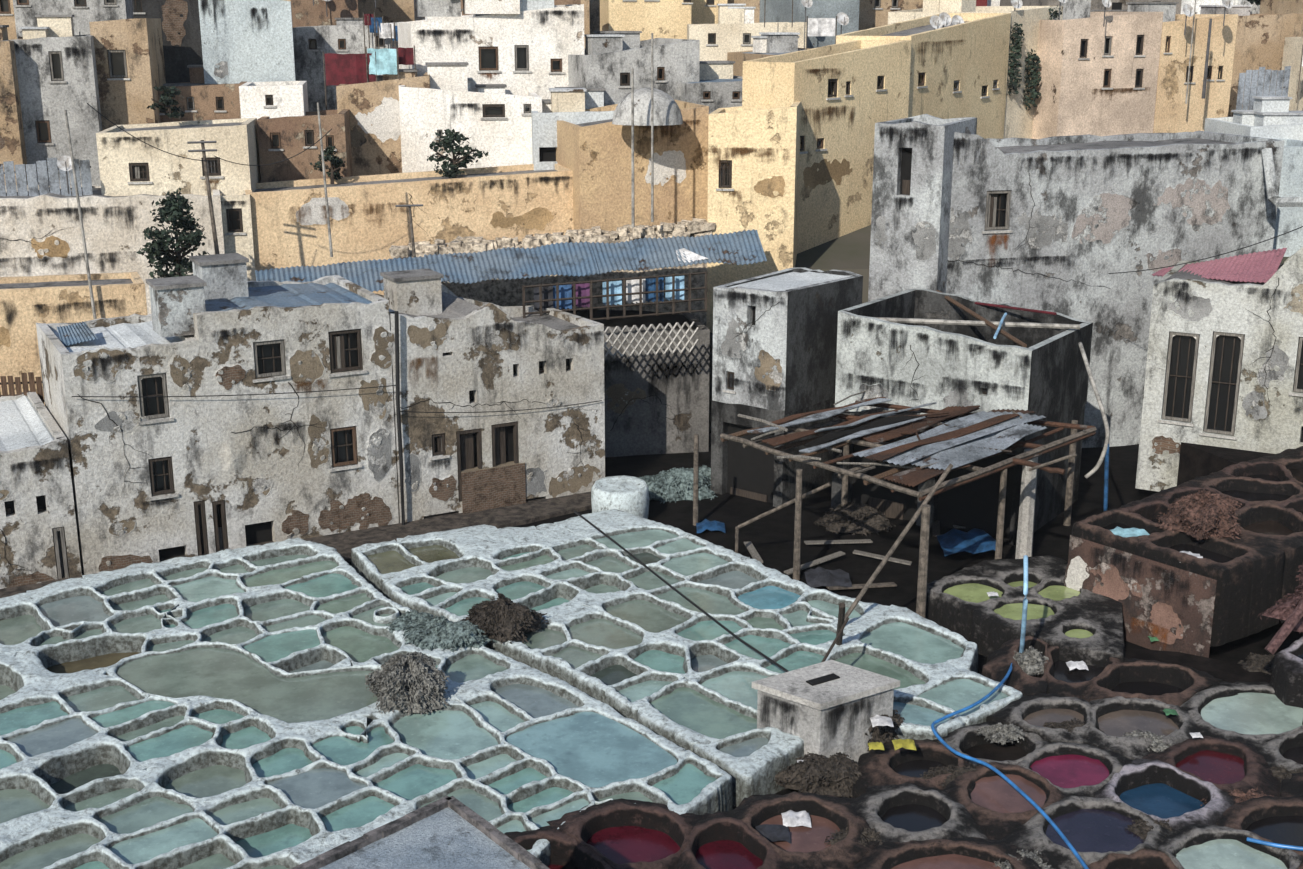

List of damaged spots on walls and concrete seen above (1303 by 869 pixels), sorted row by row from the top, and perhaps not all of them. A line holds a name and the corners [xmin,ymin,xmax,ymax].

leakage [953,139,979,160]
leakage [1028,153,1192,176]
leakage [1207,147,1277,165]
peeling [752,157,853,200]
leakage [715,292,784,304]
peeling [475,329,522,356]
peeling [168,353,194,390]
spalling [213,363,248,392]
leakage [715,378,784,397]
spalling [280,321,458,539]
peeling [1063,541,1186,647]